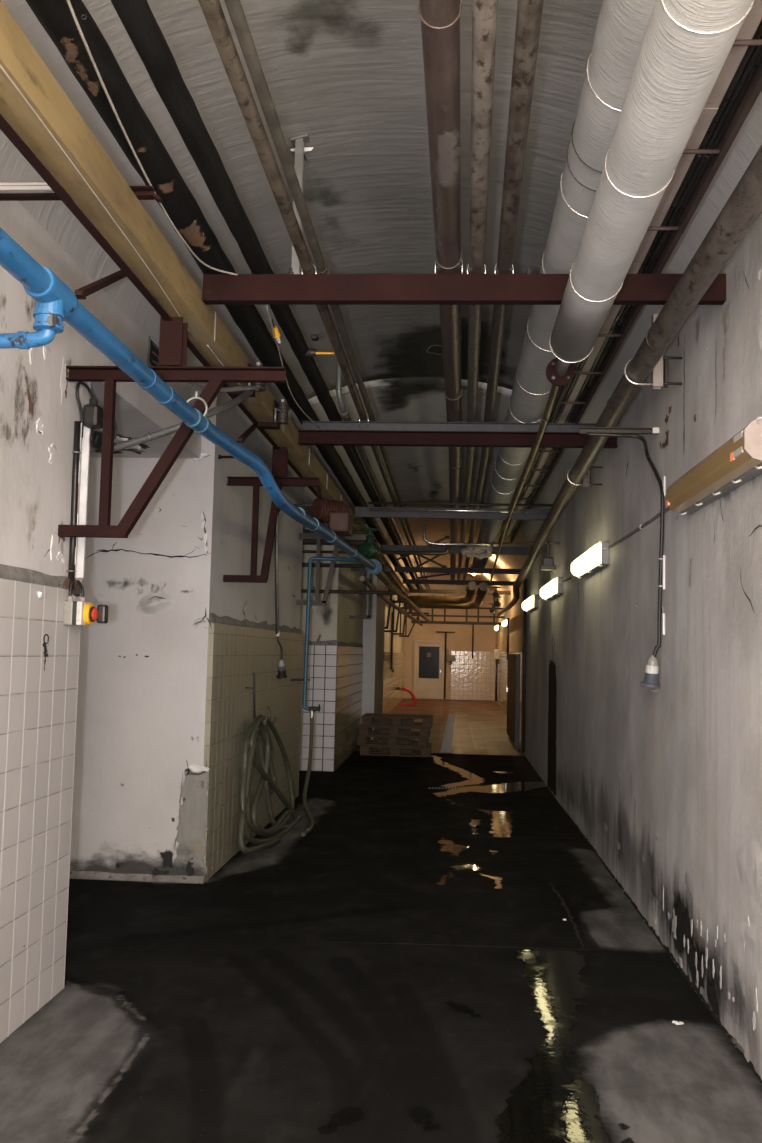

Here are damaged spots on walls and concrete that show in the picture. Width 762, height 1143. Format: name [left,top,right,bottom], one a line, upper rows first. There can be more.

crack [87,542,209,558]
flaking render [173,760,210,877]
water stain [71,842,207,883]